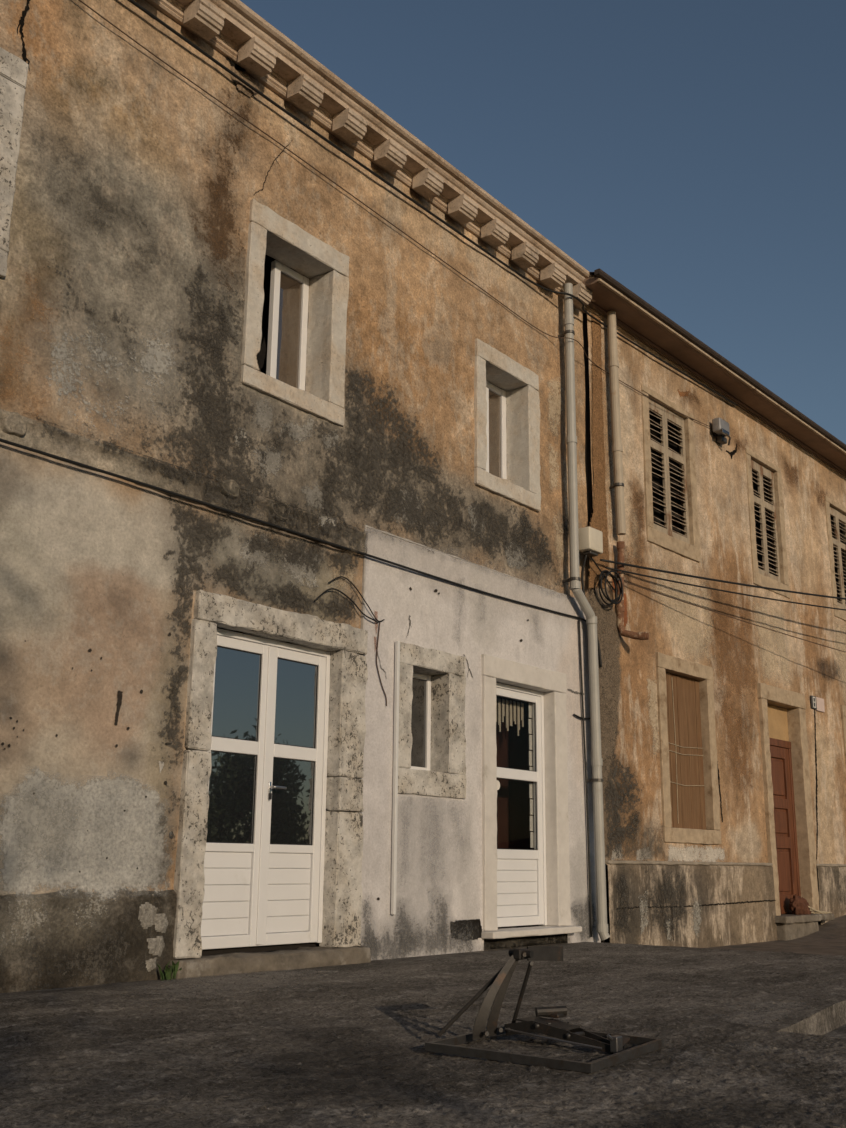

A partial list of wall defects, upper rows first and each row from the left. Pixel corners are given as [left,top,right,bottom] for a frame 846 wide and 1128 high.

crack [17,0,30,71]
leakage [0,90,569,991]
leakage [603,726,701,940]
spalling [137,902,168,972]
leakage [573,896,597,942]